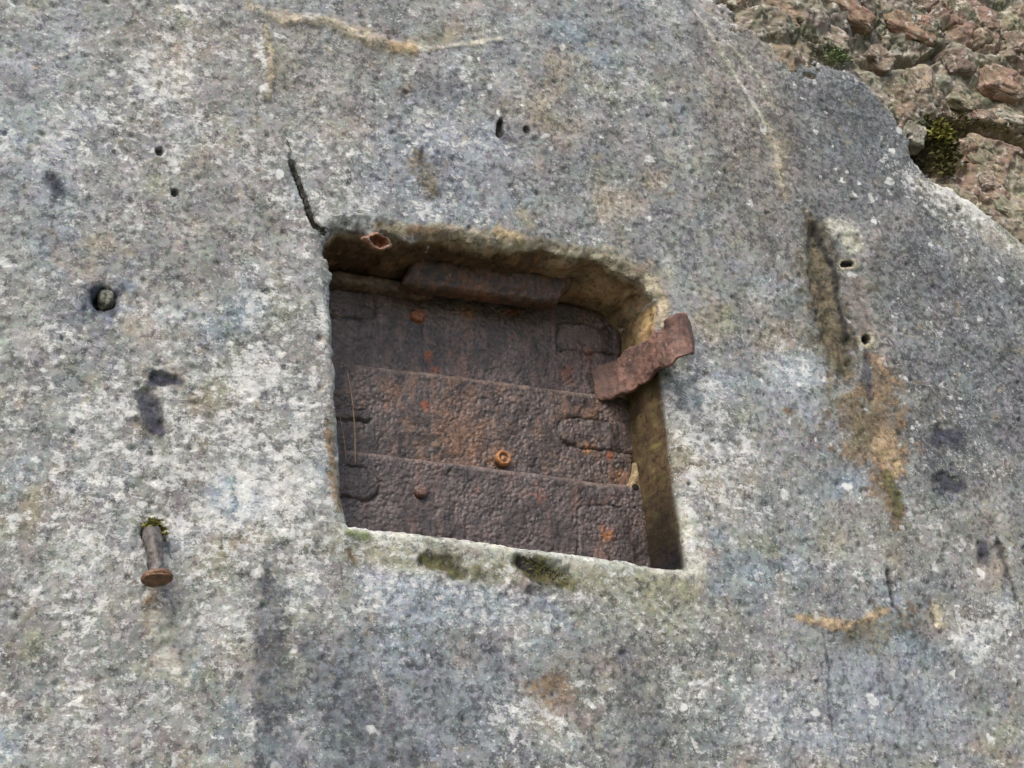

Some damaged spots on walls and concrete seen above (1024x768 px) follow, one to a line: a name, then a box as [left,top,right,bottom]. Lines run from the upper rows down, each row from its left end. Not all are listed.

crack [286,140,329,232]
corrosion [324,418,342,512]
corrosion [346,529,370,565]